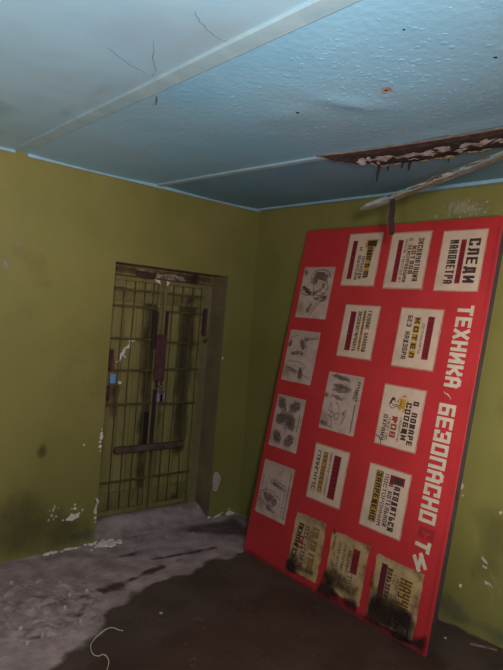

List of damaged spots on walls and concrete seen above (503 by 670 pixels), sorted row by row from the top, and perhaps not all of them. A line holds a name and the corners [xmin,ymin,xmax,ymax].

peeling [356,138,503,167]
spalling [212,471,221,493]
peeling [47,504,83,522]